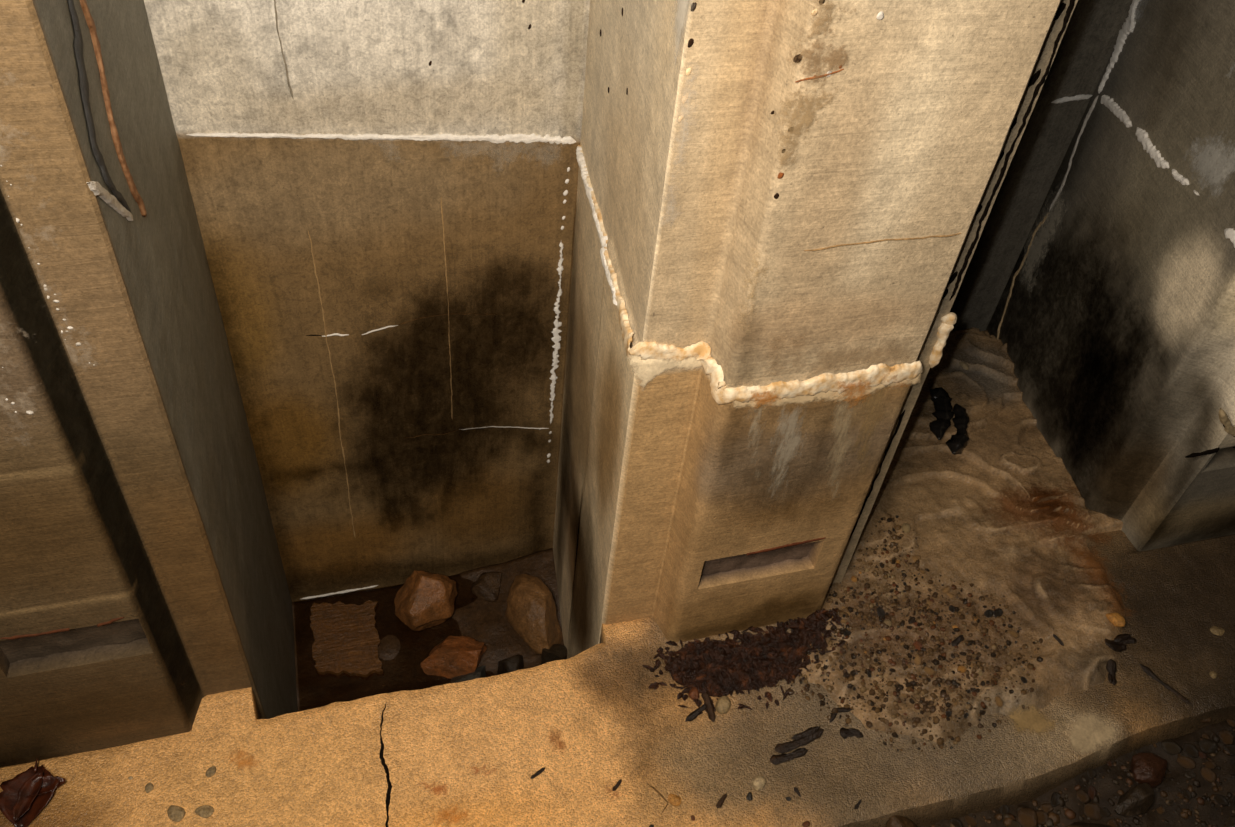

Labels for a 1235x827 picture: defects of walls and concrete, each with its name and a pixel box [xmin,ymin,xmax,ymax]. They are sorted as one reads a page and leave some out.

rust [68,0,147,221]
leakage [186,121,1029,519]
leakage [986,242,1159,482]
crack [379,704,392,827]